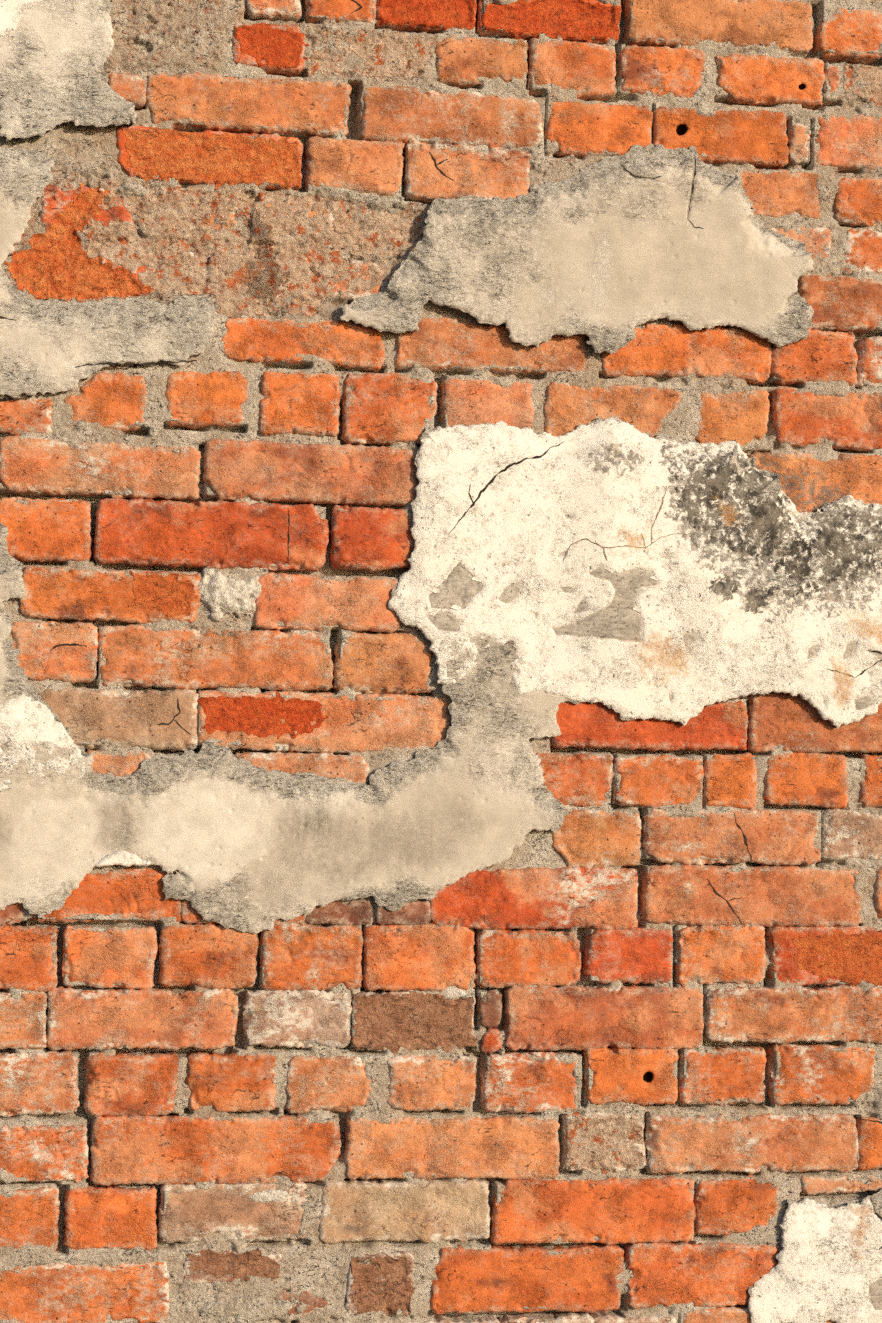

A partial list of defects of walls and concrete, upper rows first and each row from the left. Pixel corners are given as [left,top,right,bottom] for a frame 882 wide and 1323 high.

peeling [0,0,814,398]
crack [688,152,704,229]
crack [449,441,565,534]
water stain [660,441,882,623]
peeling [0,416,882,934]
spalling [348,991,477,1057]
spalling [792,929,882,987]
peeling [748,1189,882,1323]